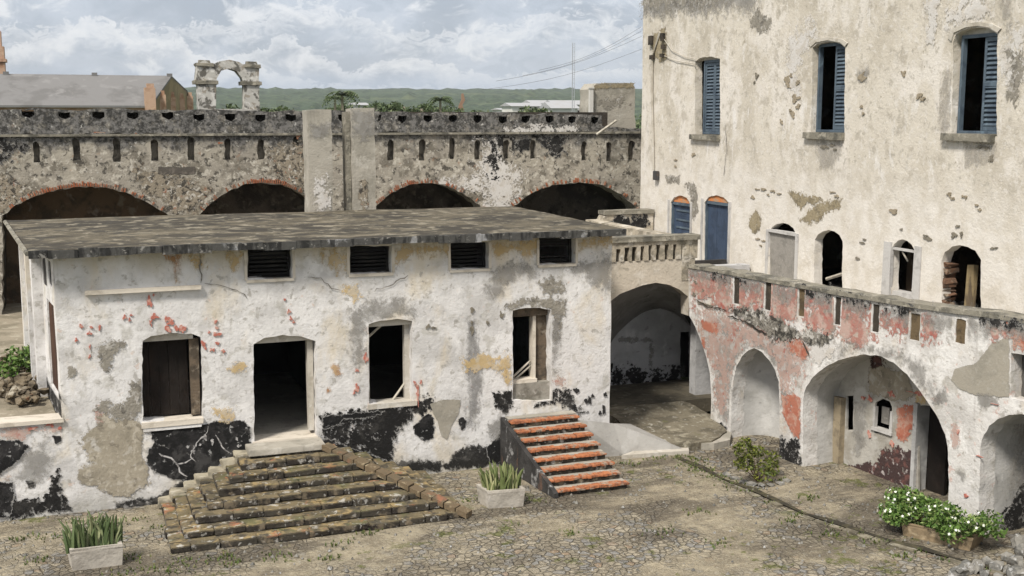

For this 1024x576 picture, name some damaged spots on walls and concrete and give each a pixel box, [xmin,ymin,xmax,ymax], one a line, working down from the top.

spalling [748,188,843,247]
peeling [75,324,126,372]
peeling [147,294,187,333]
peeling [201,320,225,354]
peeling [688,269,1024,449]
peeling [77,379,150,497]
crack [159,430,228,477]
damp [396,416,502,472]